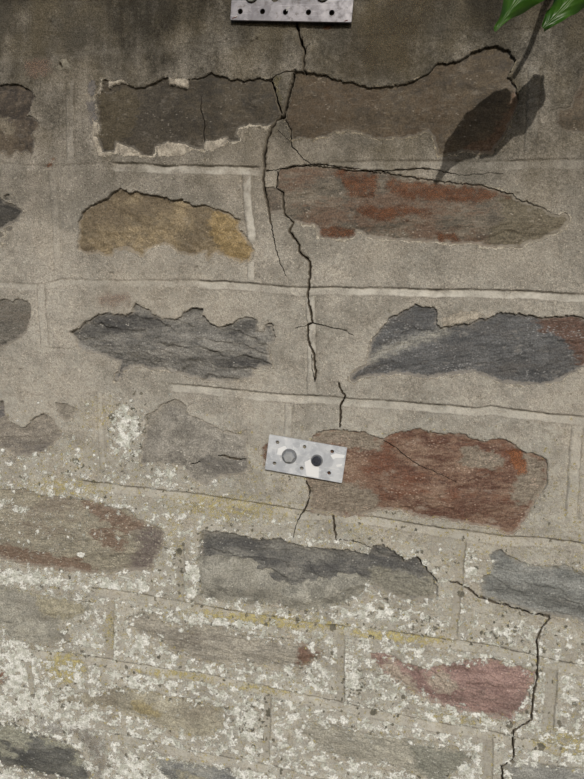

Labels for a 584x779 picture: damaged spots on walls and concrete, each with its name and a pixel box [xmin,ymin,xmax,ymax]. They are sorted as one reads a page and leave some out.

spalling [86,47,520,158]
spalling [76,189,255,265]
crack [262,22,503,382]
spalling [277,165,572,250]
spalling [72,304,276,383]
spalling [347,304,584,387]
spalling [139,400,252,487]
crack [293,480,311,538]
crack [338,382,346,427]
spalling [306,428,548,536]
spalling [197,530,438,604]
crack [399,555,551,779]